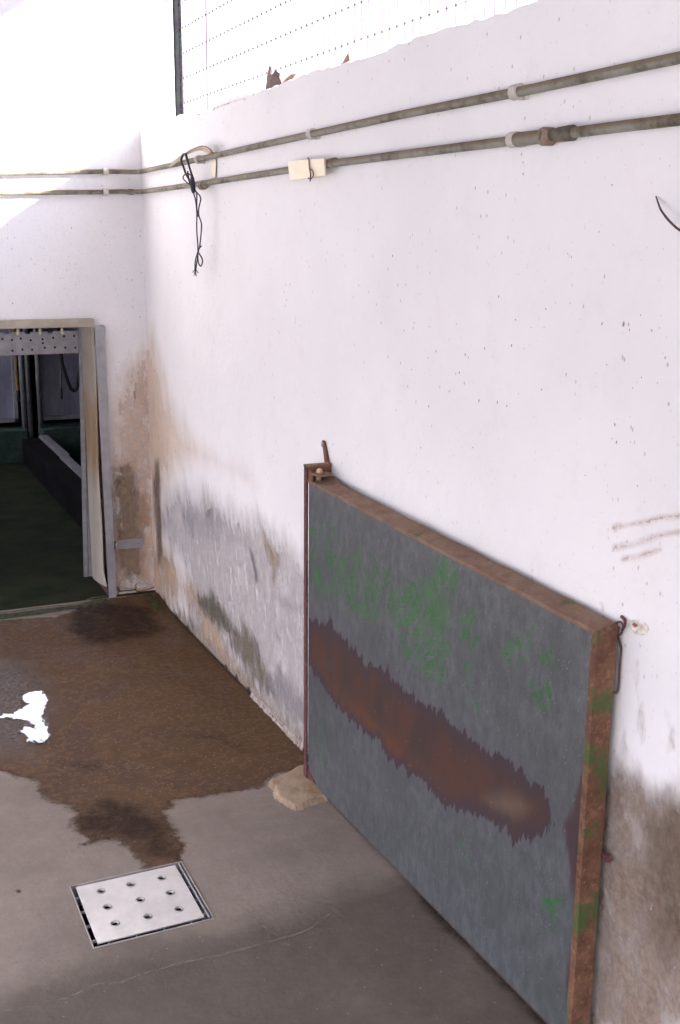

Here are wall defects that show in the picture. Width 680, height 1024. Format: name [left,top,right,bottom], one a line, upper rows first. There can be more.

water stain [0,463,304,868]
water stain [590,771,680,1024]